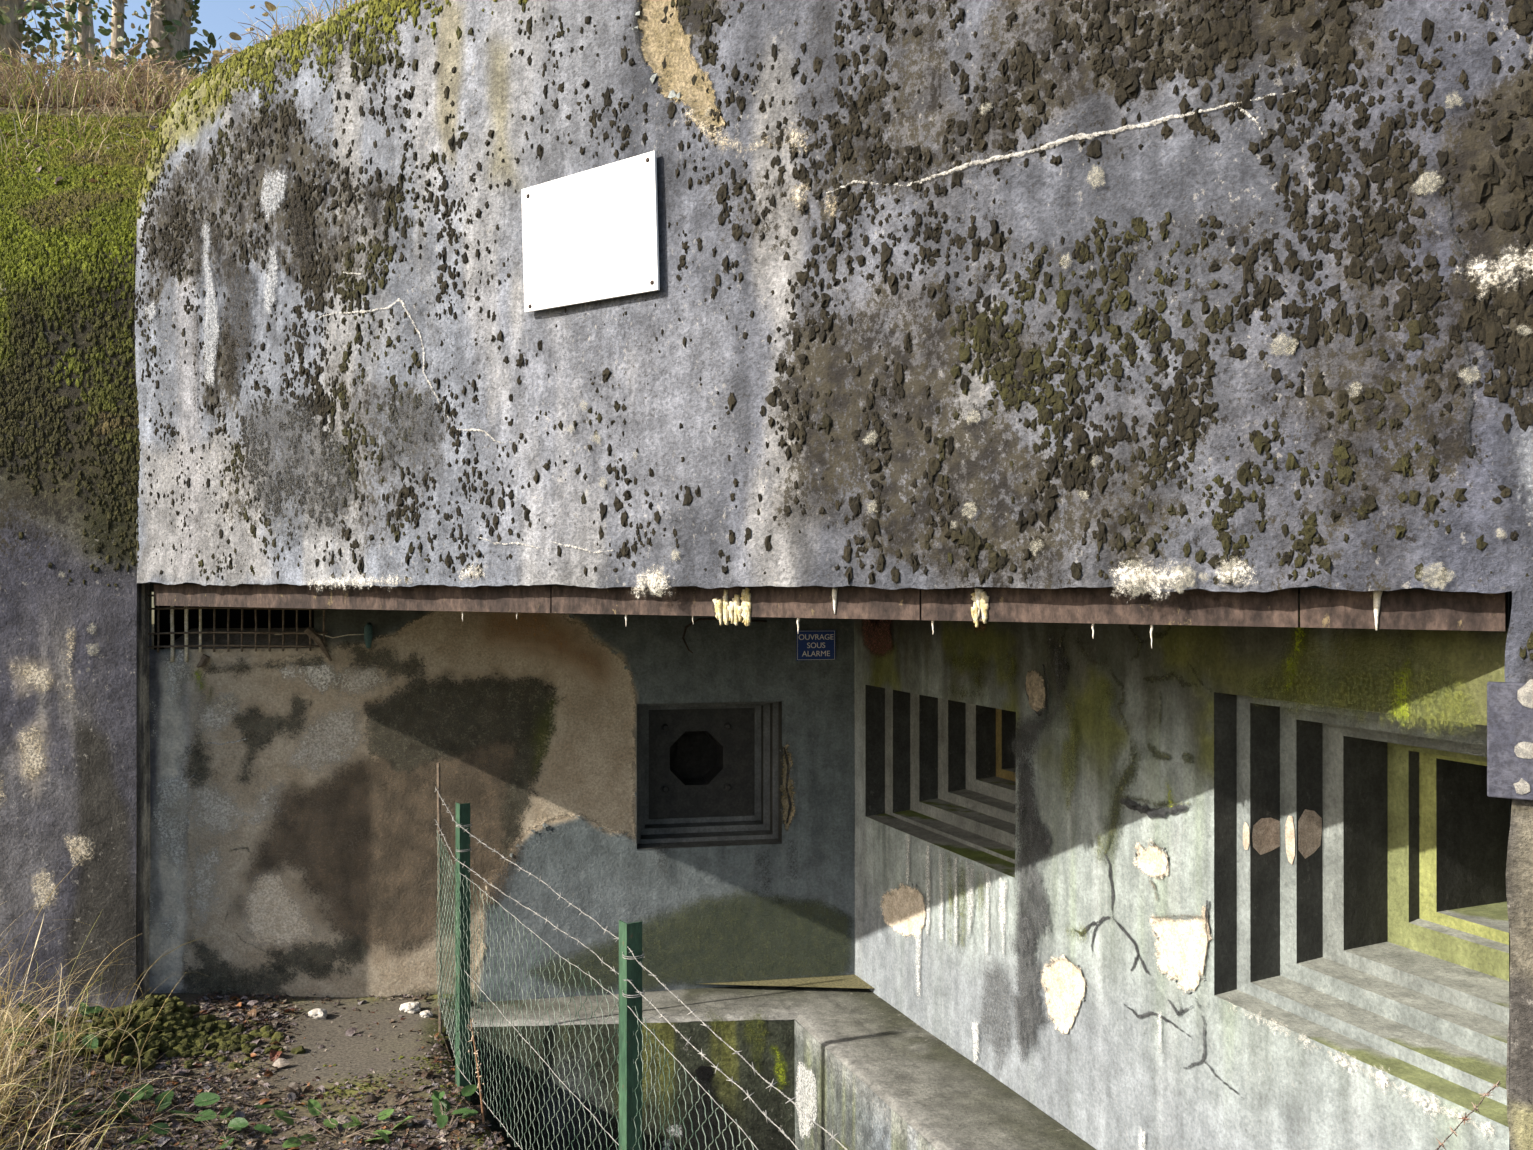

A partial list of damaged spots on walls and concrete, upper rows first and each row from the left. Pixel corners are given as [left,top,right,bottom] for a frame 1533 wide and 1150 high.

spalling [631,0,736,146]
crack [826,91,1294,193]
leakage [1468,250,1533,295]
leakage [634,568,669,598]
leakage [1113,567,1185,596]
leakage [1218,561,1252,583]
leakage [149,642,556,996]
crack [1061,625,1243,1098]
peeling [1243,809,1322,864]
spalling [880,882,926,939]
spalling [1133,839,1211,994]
spalling [1041,954,1086,1034]